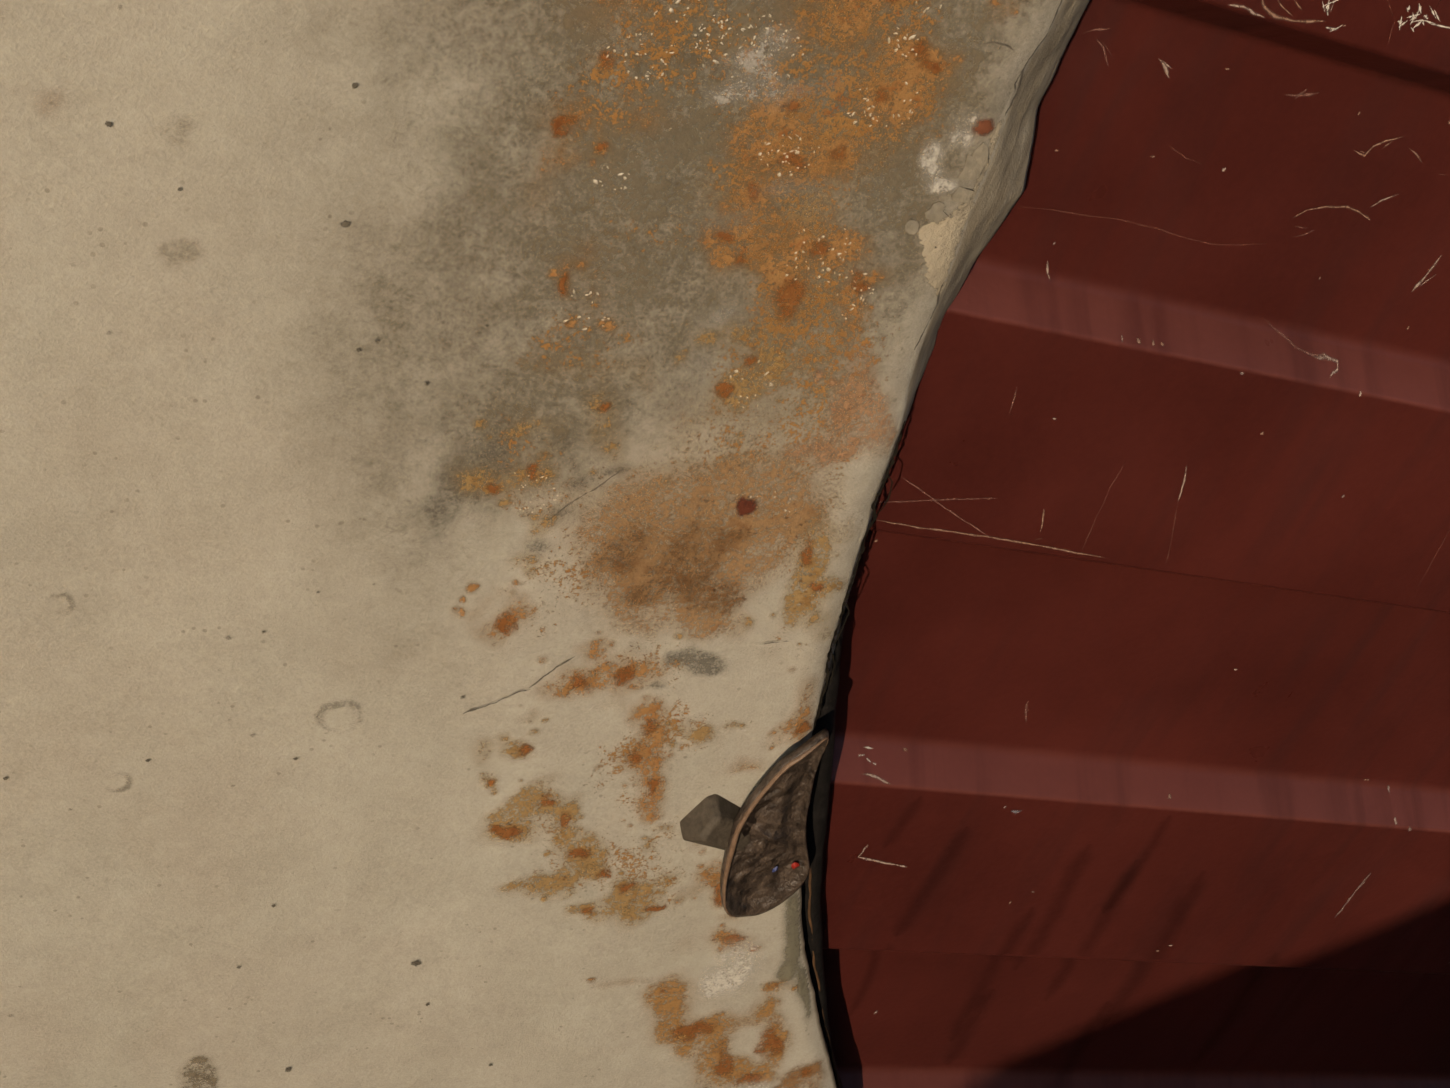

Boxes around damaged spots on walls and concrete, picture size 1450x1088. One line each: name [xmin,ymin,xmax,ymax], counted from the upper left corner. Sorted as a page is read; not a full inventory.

rust [973,119,994,135]
damp [420,0,1030,516]
rust [457,0,963,926]
rust [453,584,479,616]
crack [811,421,905,737]
rust [712,924,761,952]
rust [644,975,841,1088]